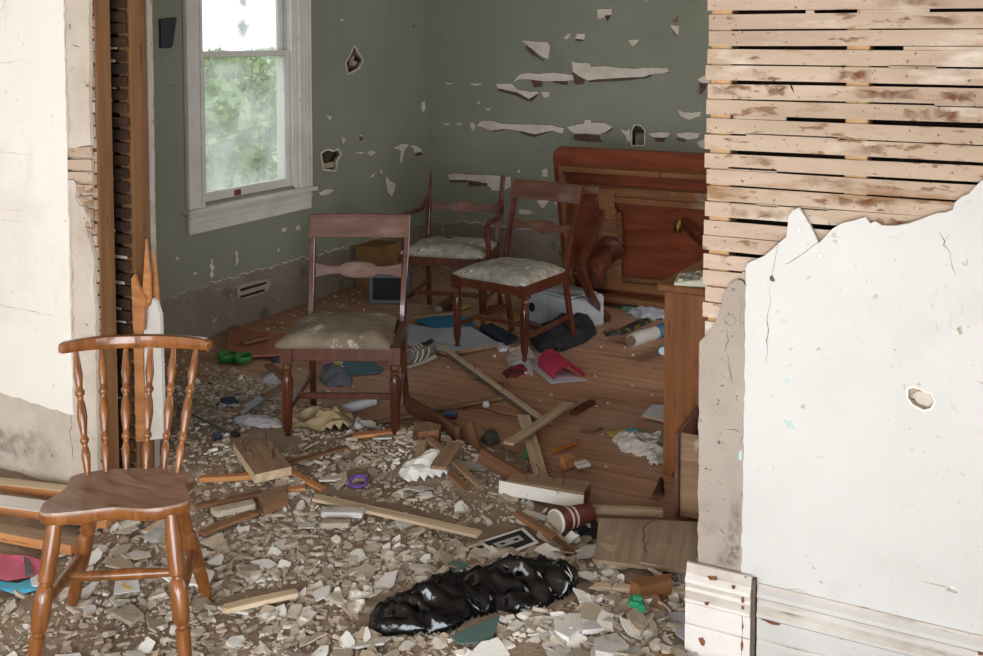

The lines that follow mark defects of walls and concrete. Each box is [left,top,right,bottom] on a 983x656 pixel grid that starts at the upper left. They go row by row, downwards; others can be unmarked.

peeling [597,8,612,21]
spalling [345,45,364,75]
peeling [522,40,551,61]
peeling [563,33,586,41]
peeling [496,61,669,102]
peeling [443,102,705,149]
spalling [321,134,376,172]
peeling [394,143,423,164]
flaking render [64,0,100,339]
peeling [370,169,396,197]
spalling [906,386,936,412]
flaking render [0,349,101,485]